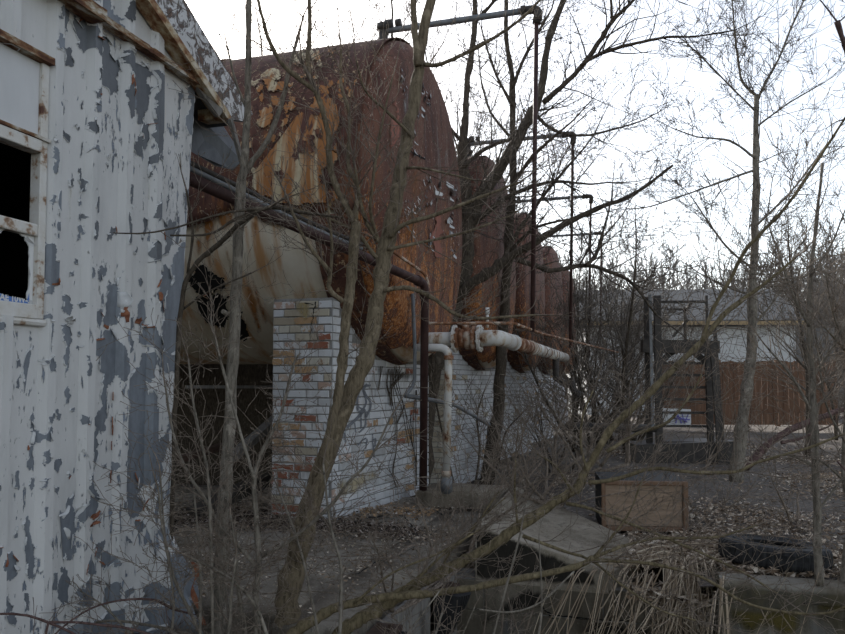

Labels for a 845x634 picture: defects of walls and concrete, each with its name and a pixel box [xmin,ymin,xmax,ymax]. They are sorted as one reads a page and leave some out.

peeling [174,84,195,136]
peeling [399,176,460,234]
peeling [426,214,457,266]
peeling [294,317,331,349]
peeling [14,168,199,634]
peeling [0,515,38,582]
peeling [5,593,29,626]